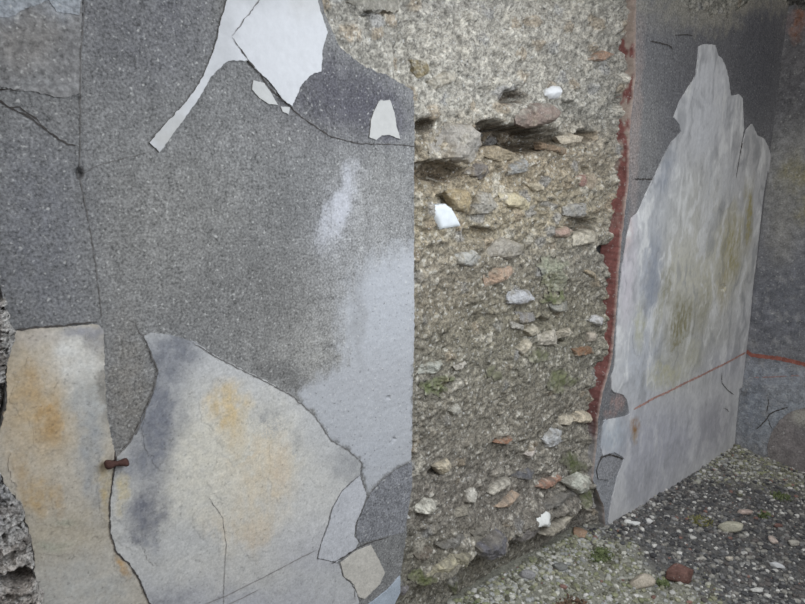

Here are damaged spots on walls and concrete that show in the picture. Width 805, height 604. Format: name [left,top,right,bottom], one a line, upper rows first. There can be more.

flaking render [149,0,328,152]
flaking render [368,100,400,140]
crack [109,321,159,604]
crack [195,344,408,564]
spalling [596,456,623,480]
crack [757,399,788,429]